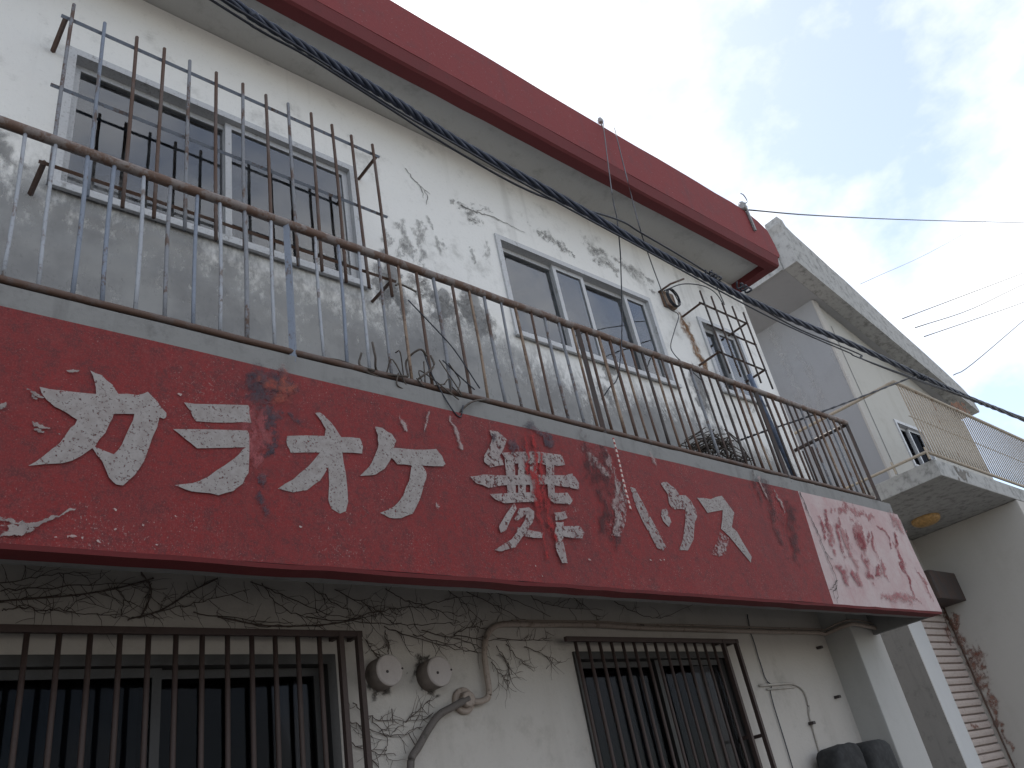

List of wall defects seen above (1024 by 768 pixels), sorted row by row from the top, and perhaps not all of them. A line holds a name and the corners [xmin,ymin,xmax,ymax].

crack [461,205,524,232]
rust [678,312,708,370]